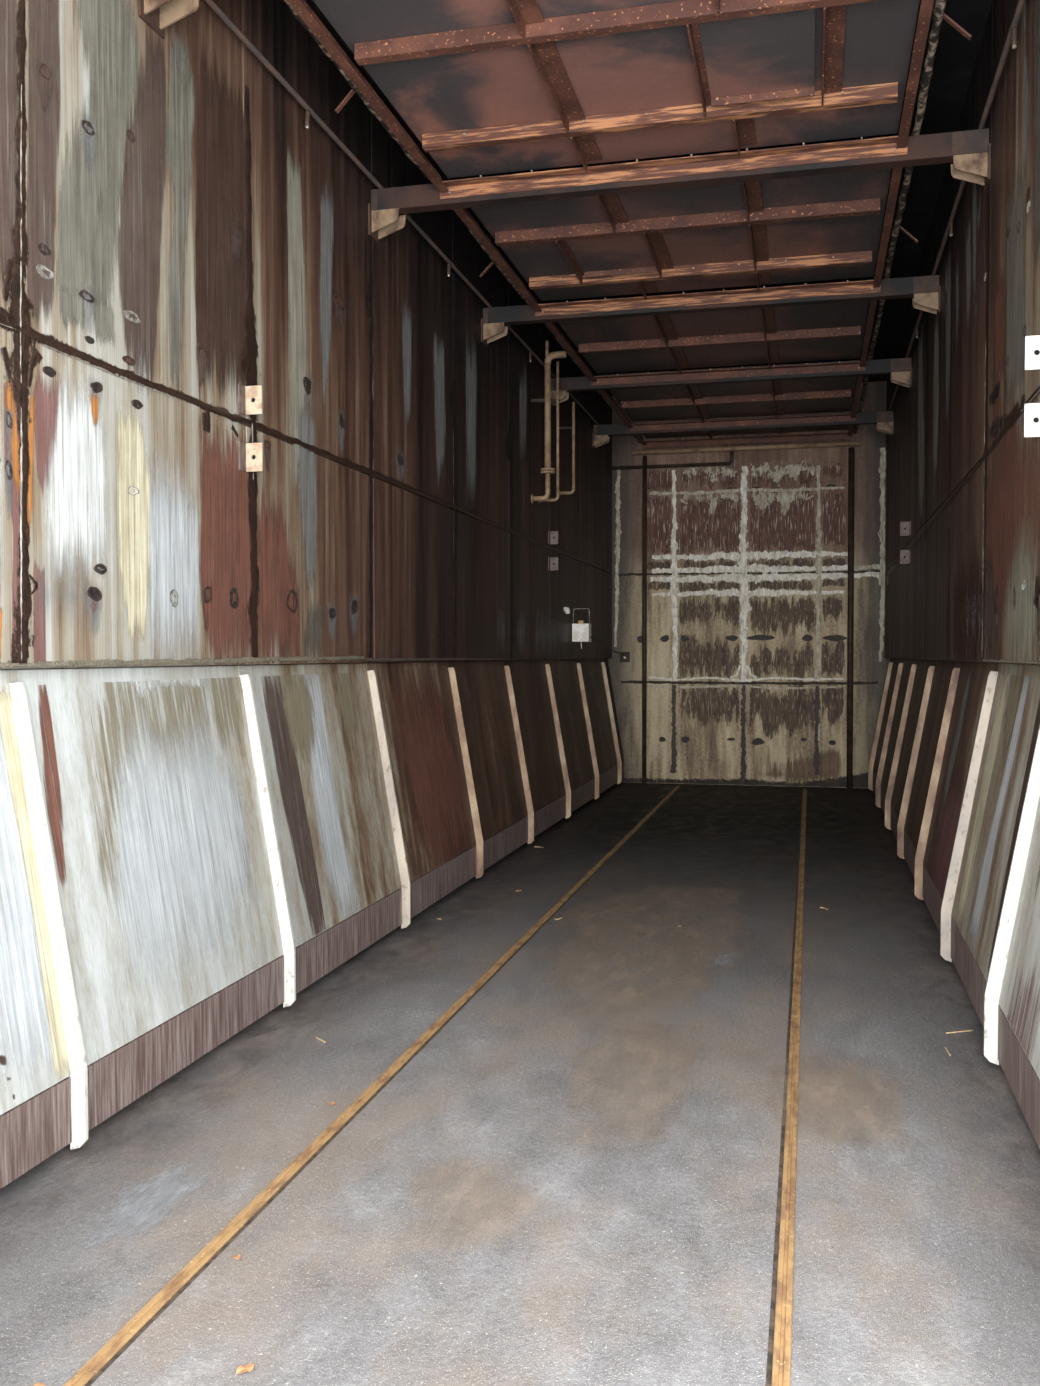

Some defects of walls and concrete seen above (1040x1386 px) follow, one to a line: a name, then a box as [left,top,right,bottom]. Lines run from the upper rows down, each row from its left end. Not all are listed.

corrosion [195,55,250,397]
corrosion [0,376,60,663]
corrosion [90,393,98,424]
water stain [647,448,896,741]